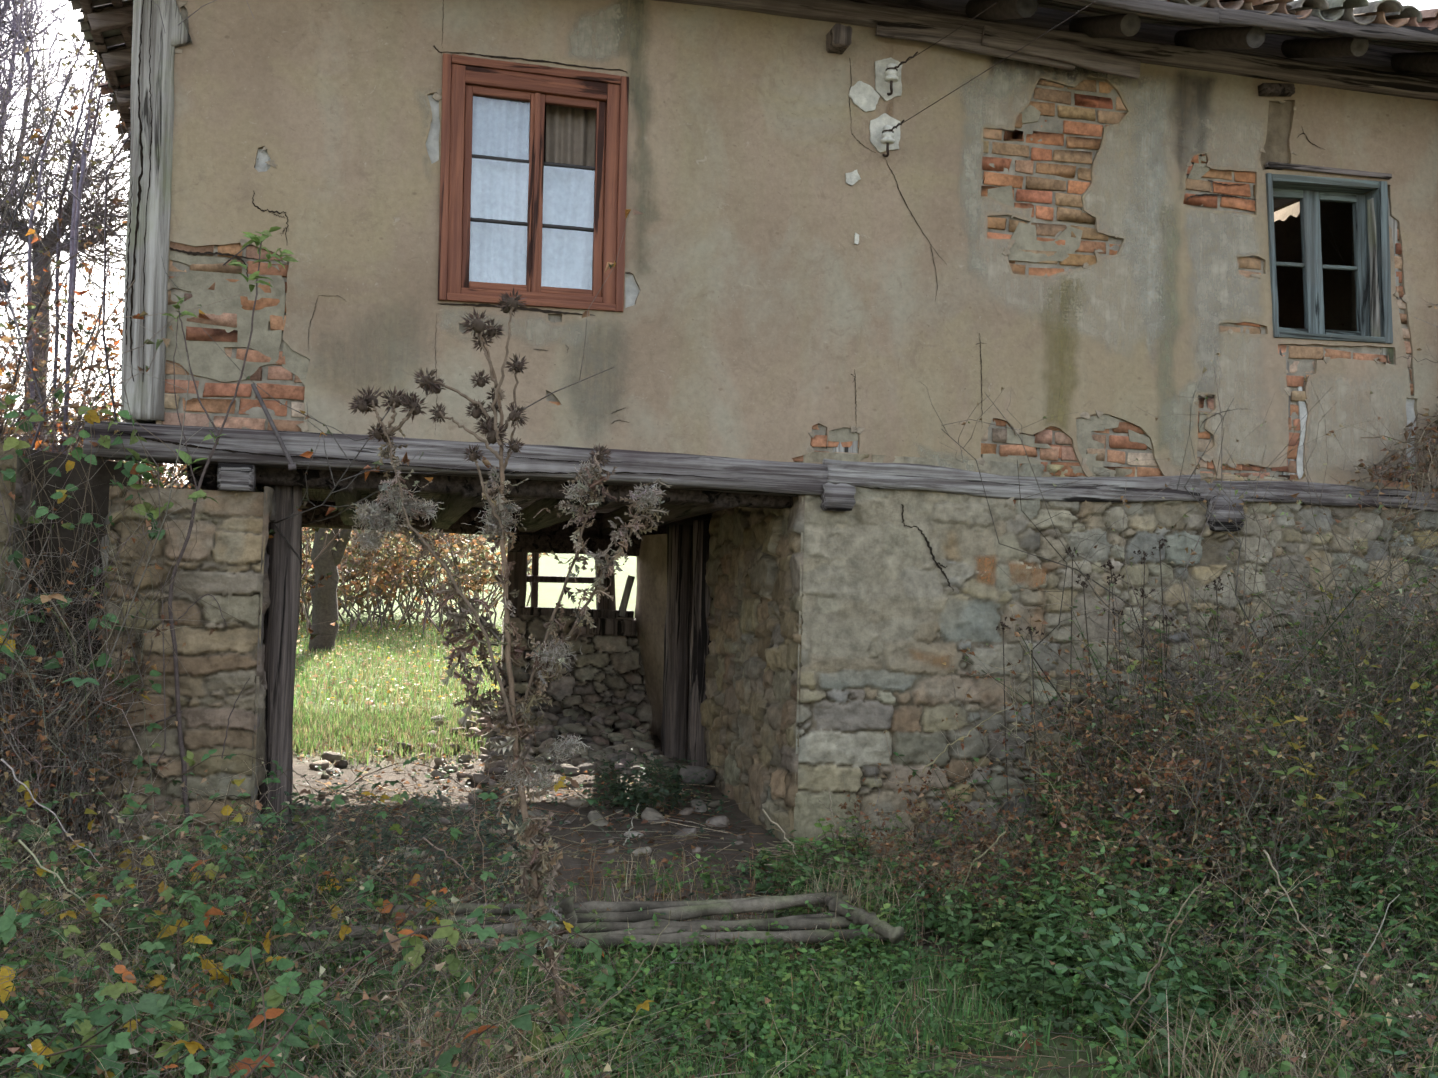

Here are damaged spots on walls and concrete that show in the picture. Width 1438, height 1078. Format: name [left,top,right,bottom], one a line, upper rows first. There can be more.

spalling [981,78,1127,278]
spalling [1183,100,1297,215]
crack [252,193,289,240]
crack [170,247,258,277]
spalling [1237,256,1263,279]
spalling [162,239,310,432]
spalling [1219,322,1266,334]
spalling [1370,224,1420,488]
spalling [792,424,865,463]
spalling [976,410,1163,477]
spalling [1194,344,1390,481]